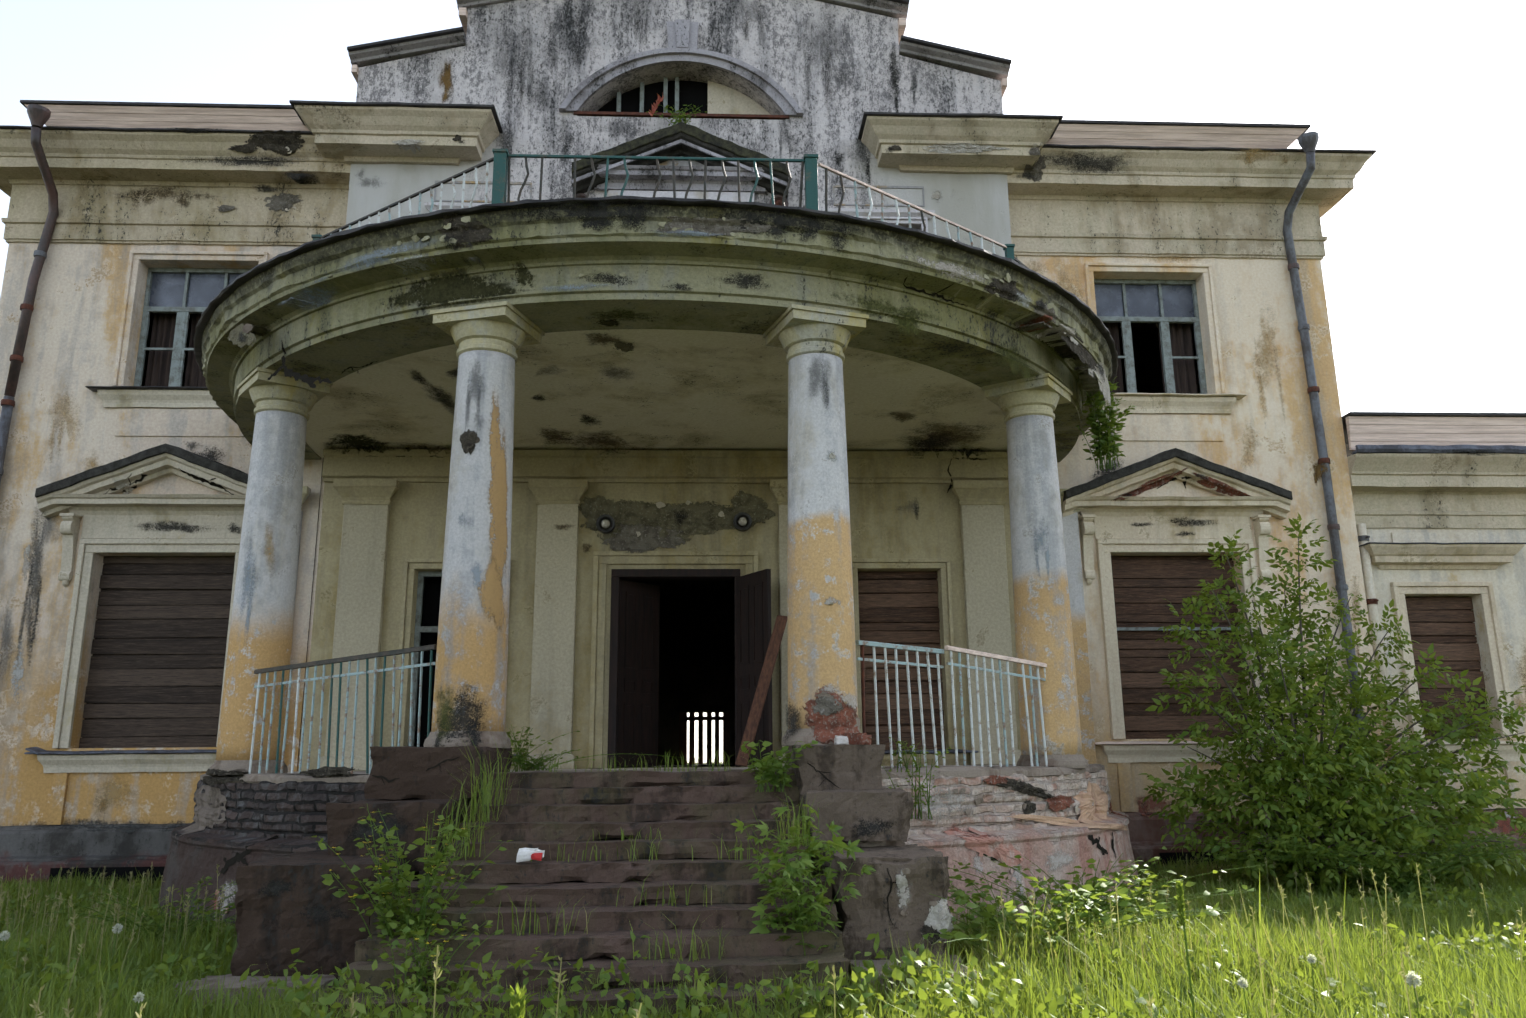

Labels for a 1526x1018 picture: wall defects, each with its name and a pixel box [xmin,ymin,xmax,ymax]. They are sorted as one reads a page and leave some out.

leakage [890,45,899,112]
leakage [834,136,870,183]
leakage [1044,151,1128,175]
leakage [715,205,861,252]
leakage [389,262,533,308]
leakage [412,369,480,419]
leakage [327,434,449,458]
peeling [460,397,508,628]
peeling [578,490,775,553]
leakage [3,518,52,695]
spalling [783,684,860,745]
spalling [916,775,1079,873]